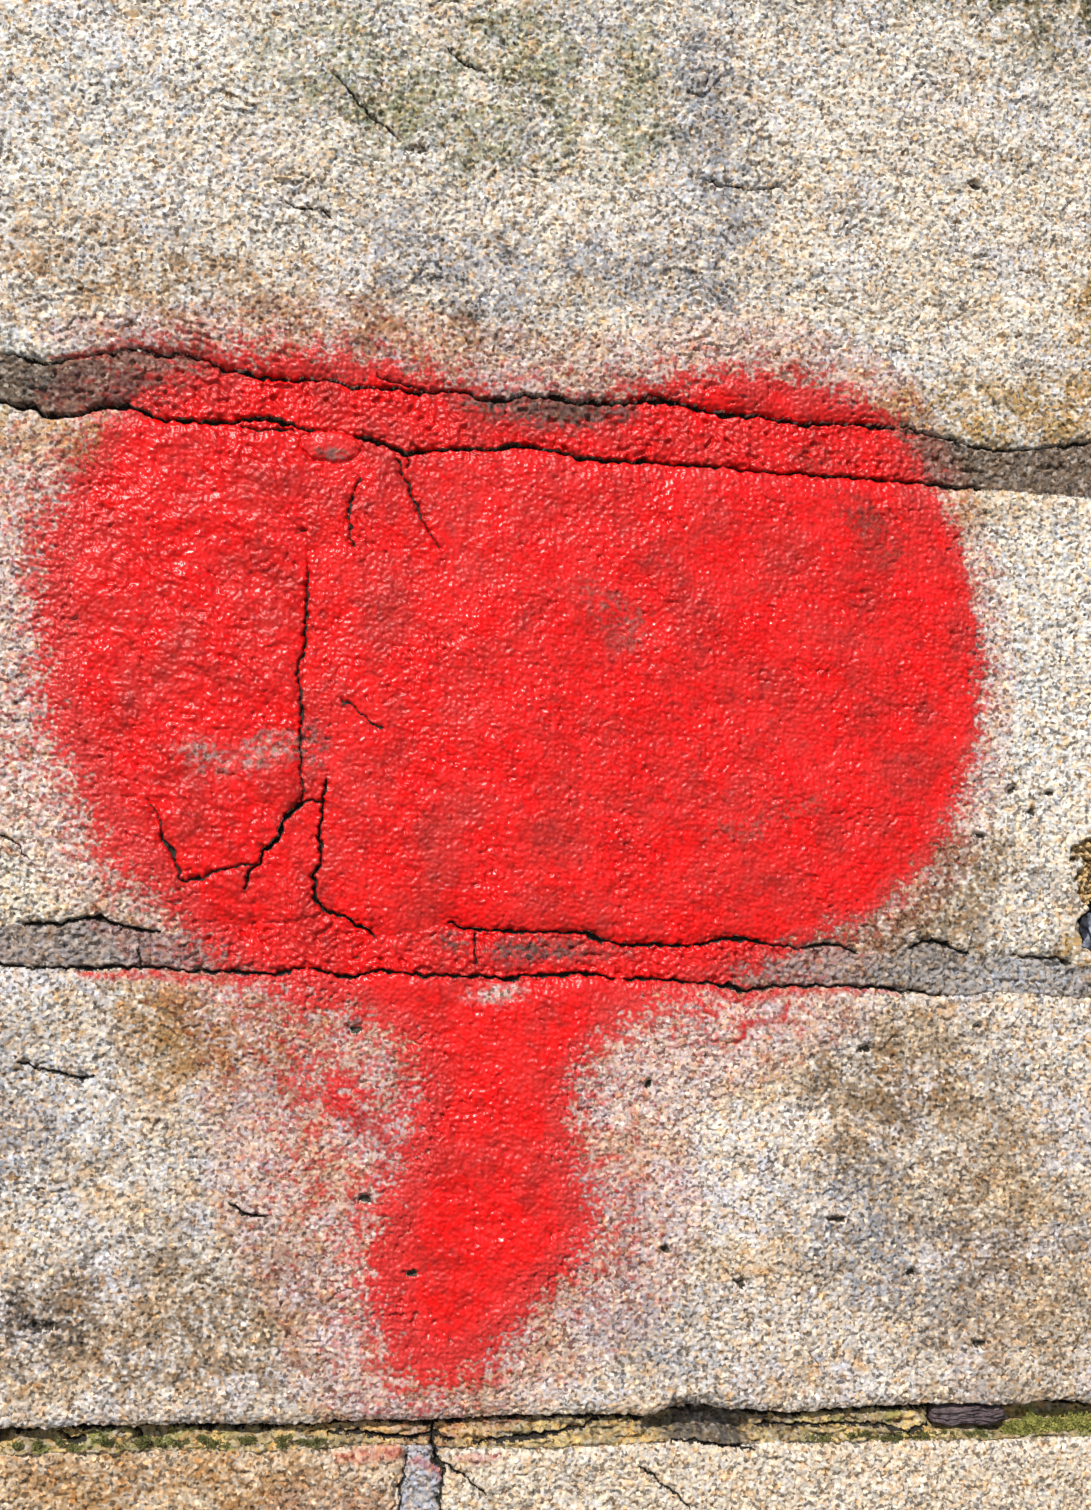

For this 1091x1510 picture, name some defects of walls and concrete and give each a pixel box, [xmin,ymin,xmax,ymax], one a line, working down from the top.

crack [0,571,940,996]
crack [908,938,969,955]
crack [1010,953,1072,966]